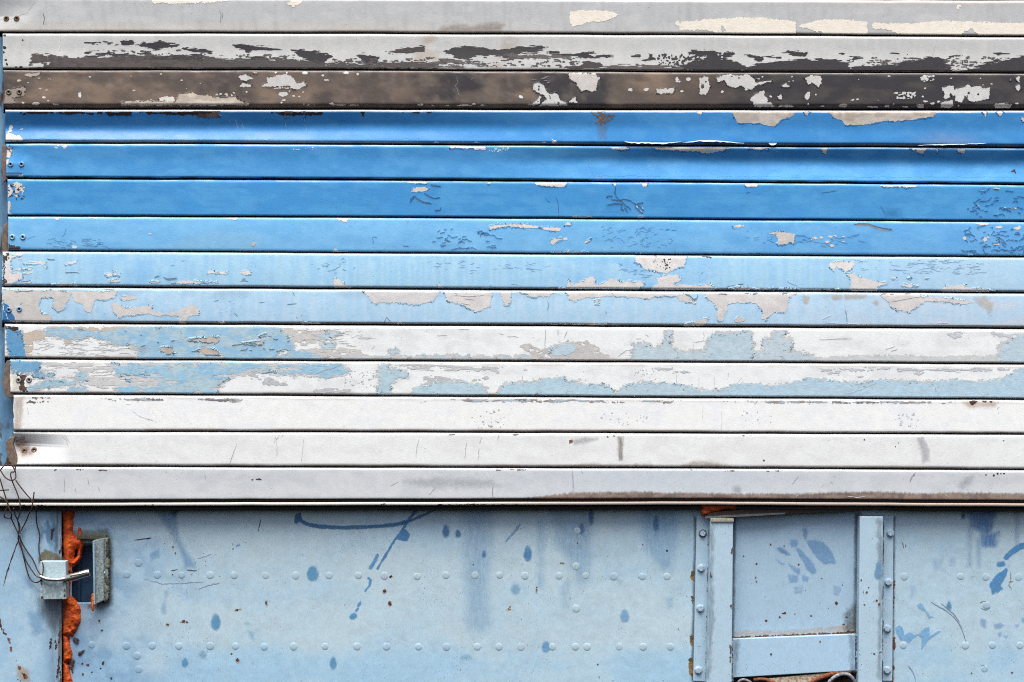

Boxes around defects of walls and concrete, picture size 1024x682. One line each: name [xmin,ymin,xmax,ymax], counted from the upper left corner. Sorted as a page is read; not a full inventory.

peeling [3,34,601,119]
peeling [628,53,1024,127]
rust [591,111,615,125]
peeling [434,141,509,152]
peeling [654,146,730,155]
peeling [407,180,430,193]
peeling [487,216,592,254]
peeling [767,229,796,247]
peeling [2,251,1024,429]